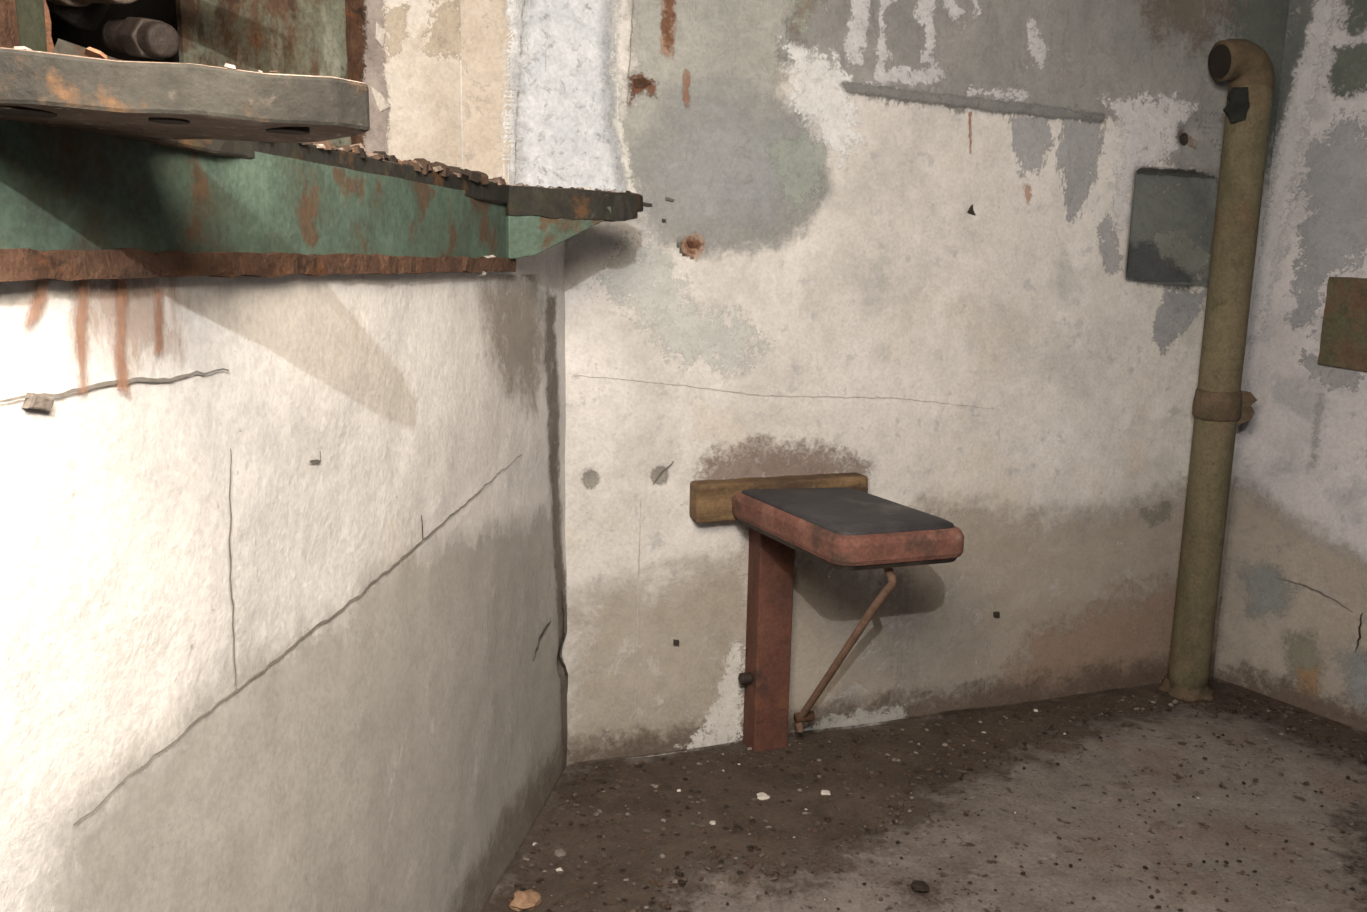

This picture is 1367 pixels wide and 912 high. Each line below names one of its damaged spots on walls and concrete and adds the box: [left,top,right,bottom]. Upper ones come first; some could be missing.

corrosion [660,0,676,57]
corrosion [627,72,657,105]
corrosion [682,70,690,106]
peeling [622,0,1267,277]
corrosion [681,233,705,258]
peeling [1283,108,1367,393]
corrosion [26,279,49,326]
corrosion [76,278,180,394]
peeling [1152,287,1207,355]
leakage [788,486,1187,734]
crack [1275,577,1363,652]
leakage [567,564,748,764]